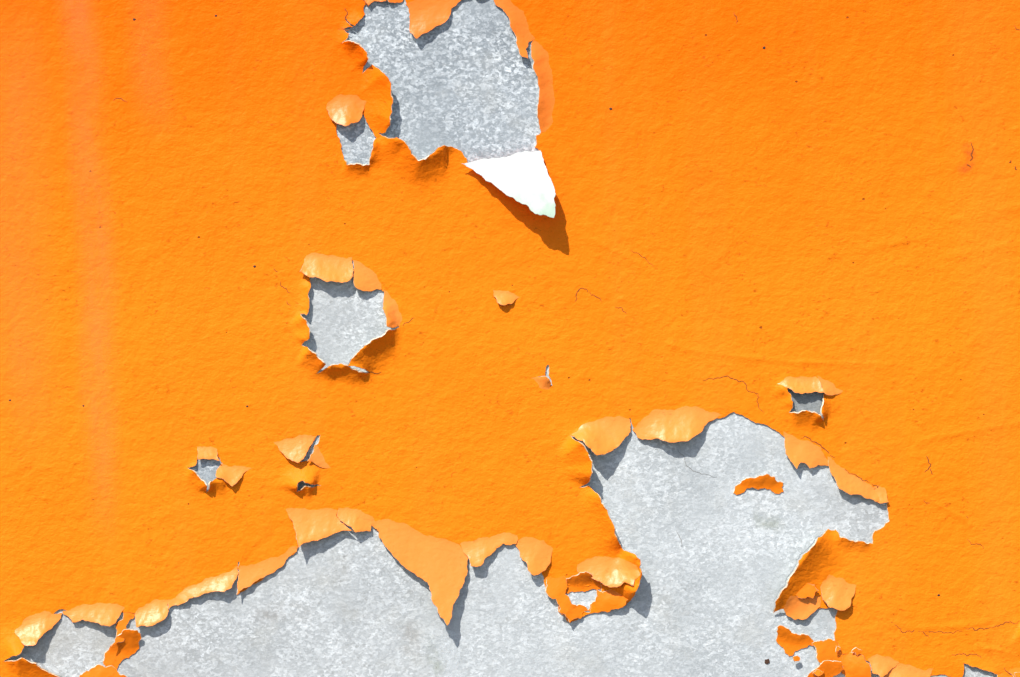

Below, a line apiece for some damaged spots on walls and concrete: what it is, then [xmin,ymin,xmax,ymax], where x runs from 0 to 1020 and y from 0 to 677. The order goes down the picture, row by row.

peeling [326,0,556,218]
peeling [300,252,402,372]
peeling [493,290,520,306]
peeling [777,376,843,414]
peeling [5,406,947,677]
peeling [963,664,1020,677]